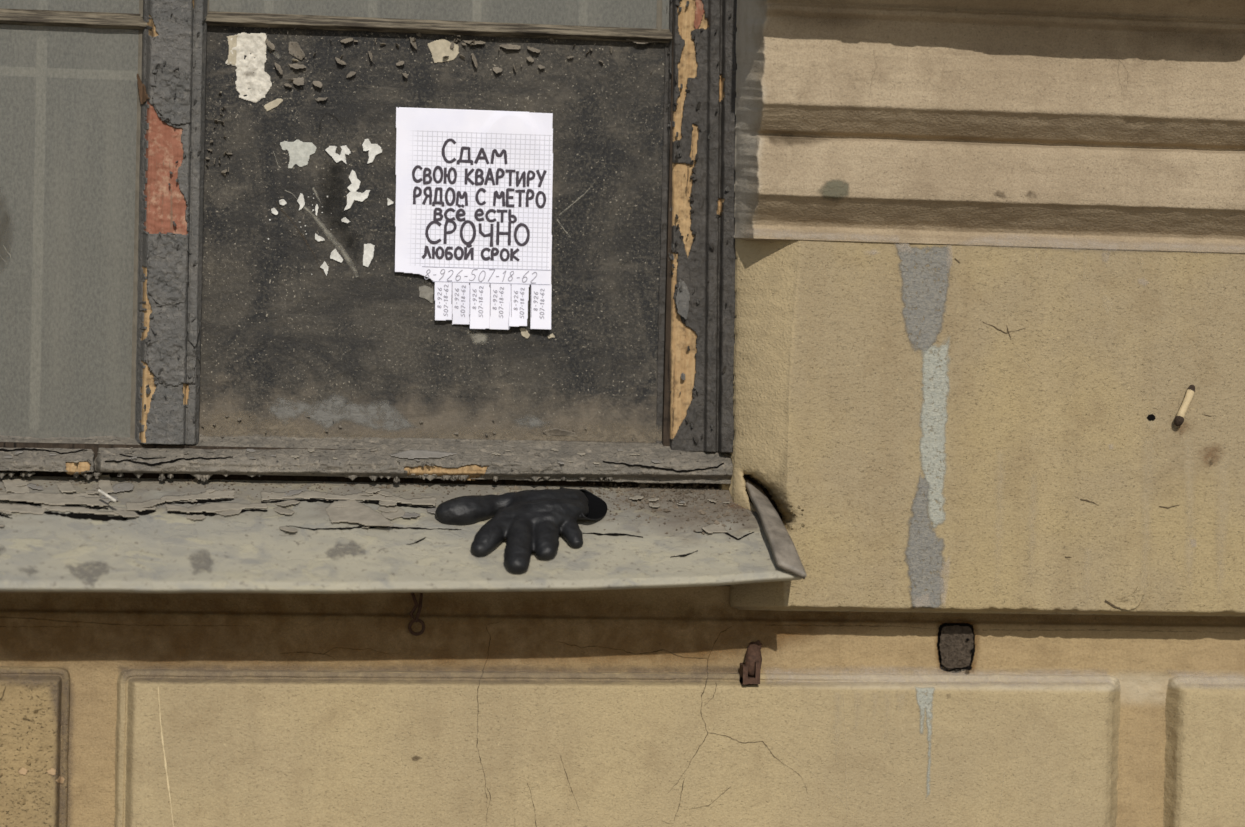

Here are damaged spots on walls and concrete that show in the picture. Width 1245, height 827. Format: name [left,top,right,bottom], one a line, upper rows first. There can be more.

peeling [227,35,238,82]
peeling [264,26,327,111]
peeling [331,32,554,78]
peeling [716,61,726,112]
peeling [137,74,233,265]
peeling [626,0,717,453]
peeling [177,309,250,437]
peeling [0,452,167,527]
peeling [325,487,437,528]
spalling [743,475,805,529]
crack [561,626,807,824]